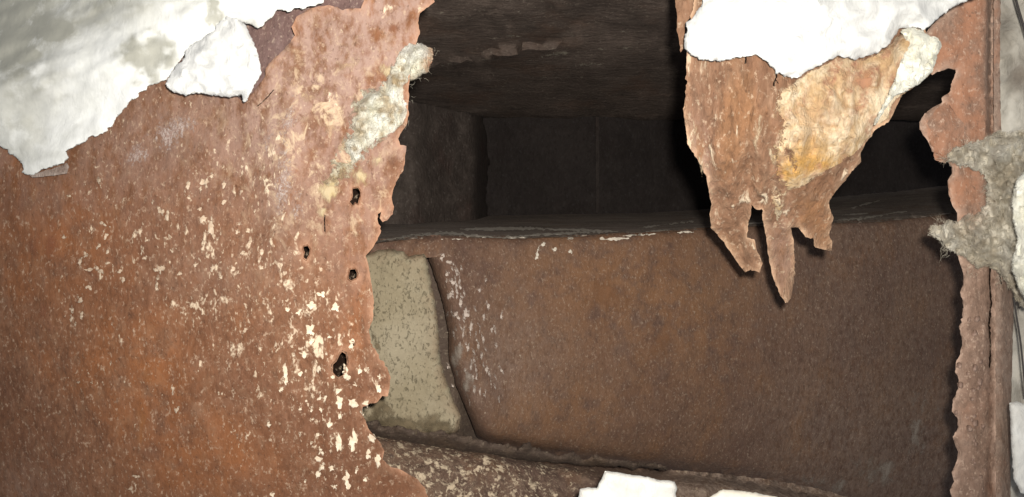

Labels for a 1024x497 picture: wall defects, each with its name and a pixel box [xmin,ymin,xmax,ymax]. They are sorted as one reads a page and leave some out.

peeling [155,117,194,151]
peeling [78,221,125,283]
peeling [186,174,226,243]
peeling [384,220,694,259]
peeling [279,291,339,392]
peeling [298,352,381,489]